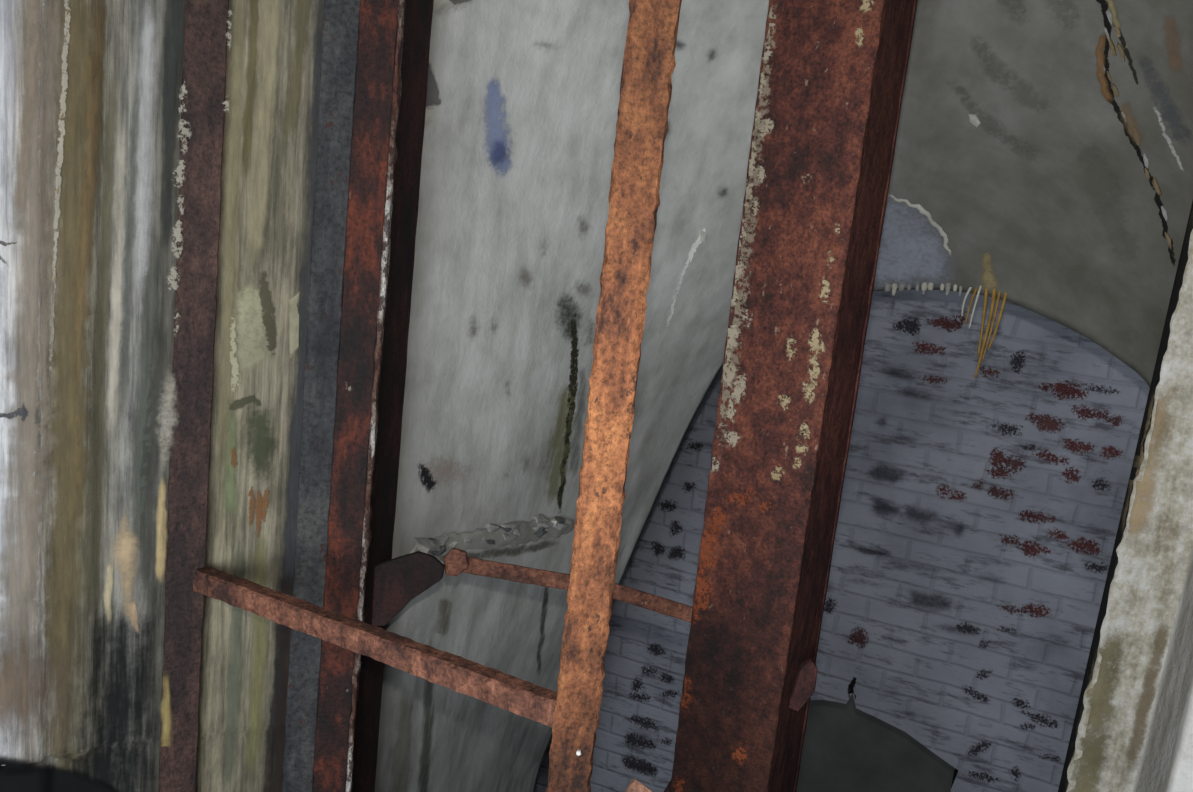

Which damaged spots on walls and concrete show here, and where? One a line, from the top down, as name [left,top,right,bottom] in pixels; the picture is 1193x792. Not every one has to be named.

damp [131,0,185,237]
crack [1096,0,1183,264]
crack [0,241,16,264]
peeling [717,5,776,447]
spalling [875,195,951,285]
damp [0,0,163,792]
peeling [786,329,824,404]
corrosion [156,482,166,578]
corrosion [693,489,771,620]
corrosion [162,680,170,747]
peeling [622,644,679,776]
damp [1127,629,1166,761]